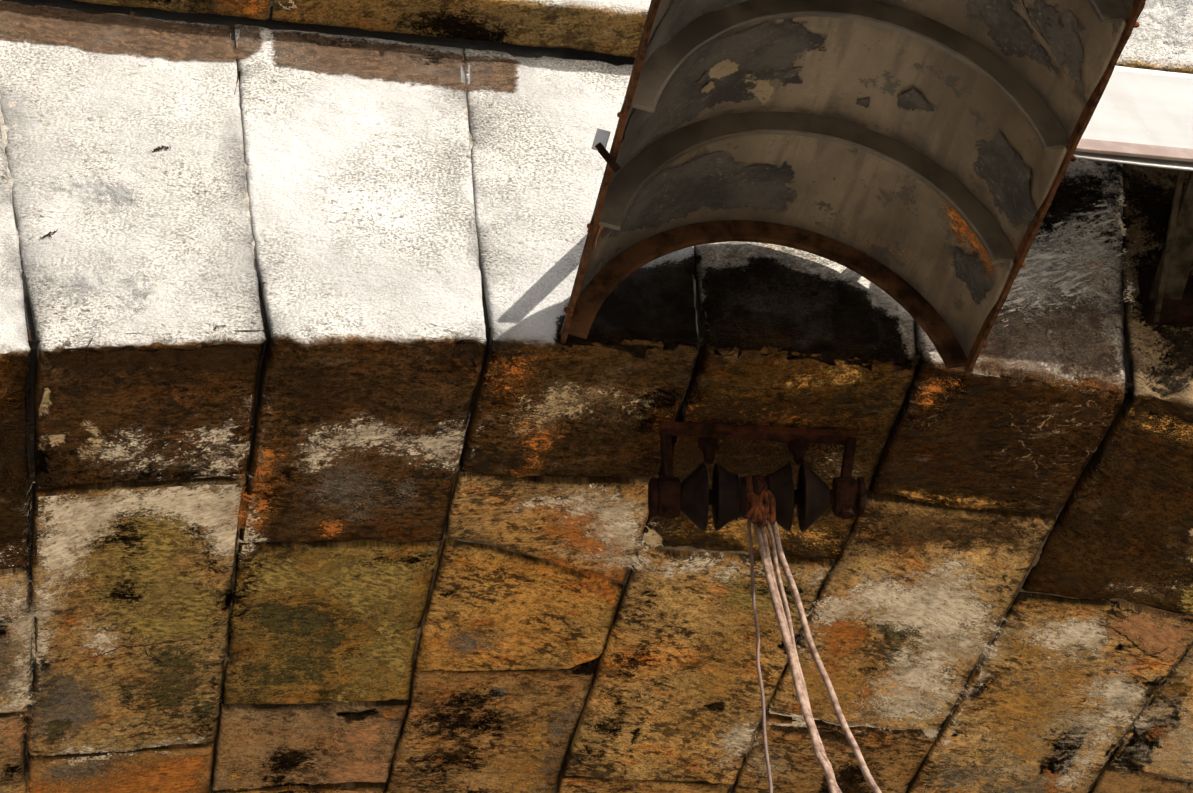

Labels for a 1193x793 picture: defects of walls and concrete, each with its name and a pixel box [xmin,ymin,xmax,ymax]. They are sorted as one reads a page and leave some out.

peeling [642,0,749,67]
peeling [610,18,827,183]
peeling [598,151,797,238]
peeling [973,133,1036,230]
peeling [953,246,994,305]
leakage [960,159,1193,401]
leakage [268,342,475,472]
leakage [0,419,267,786]
leakage [337,551,444,566]
leakage [507,254,1193,793]
leakage [228,677,568,793]